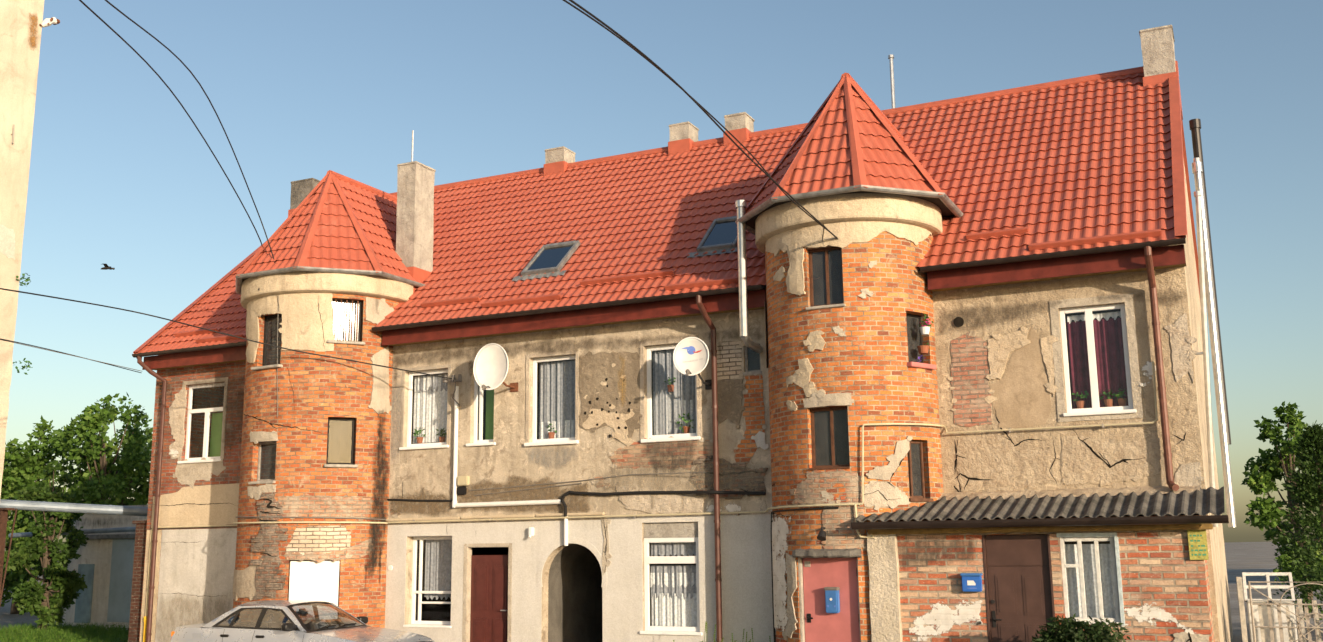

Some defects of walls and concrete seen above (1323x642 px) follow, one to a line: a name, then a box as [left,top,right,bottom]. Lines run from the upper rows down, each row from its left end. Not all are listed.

flaking render [168,389,206,482]
flaking render [579,340,806,642]
flaking render [786,326,854,411]
flaking render [821,436,913,510]
flaking render [948,326,1058,492]
crack [995,410,1142,483]
spalling [233,483,353,601]
peeling [909,600,983,642]
peeling [1122,602,1209,642]